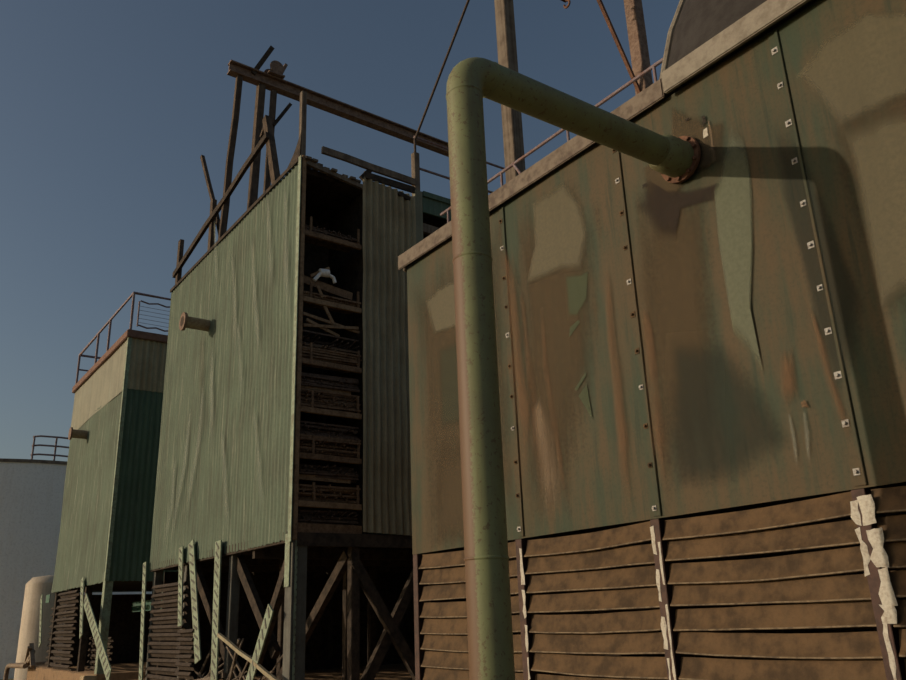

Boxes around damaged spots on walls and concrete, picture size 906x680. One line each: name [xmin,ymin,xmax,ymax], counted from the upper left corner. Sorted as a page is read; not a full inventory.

rust [505,260,535,431]